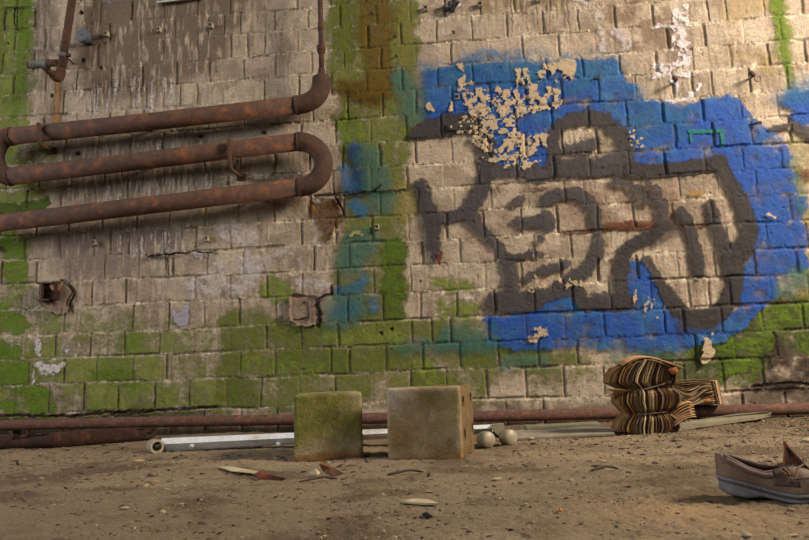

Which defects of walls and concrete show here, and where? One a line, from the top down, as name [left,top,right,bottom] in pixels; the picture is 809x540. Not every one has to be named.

damp [332,0,411,109]
peeling [448,58,577,170]
rust [308,197,346,255]
damp [31,339,66,385]
damp [757,335,809,391]